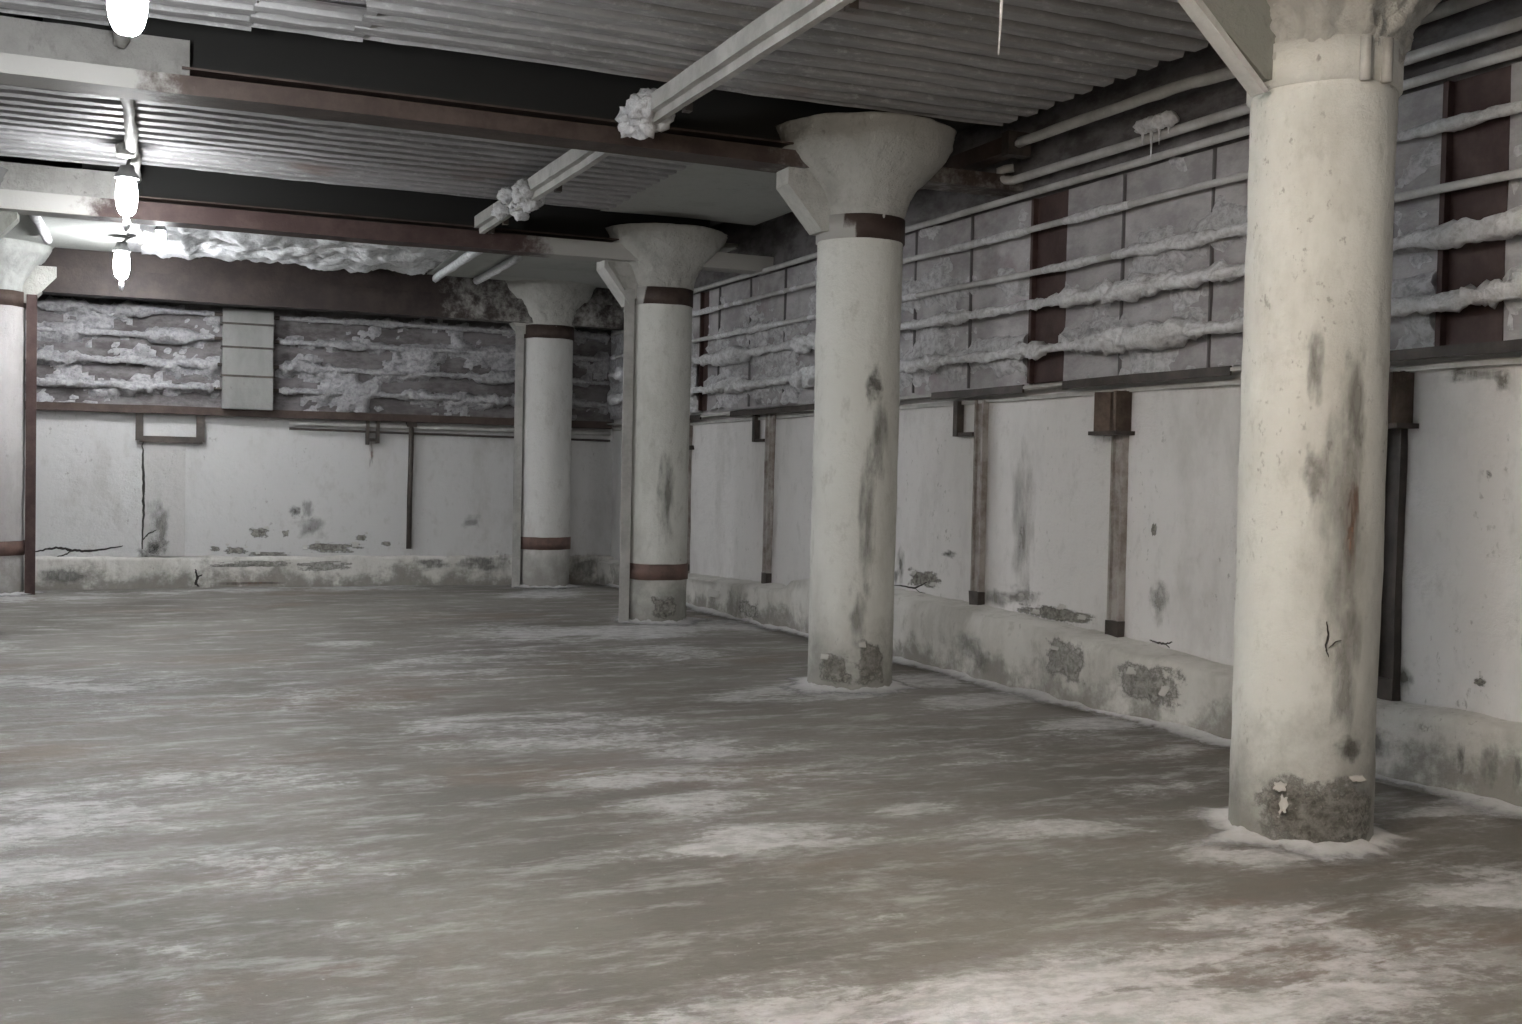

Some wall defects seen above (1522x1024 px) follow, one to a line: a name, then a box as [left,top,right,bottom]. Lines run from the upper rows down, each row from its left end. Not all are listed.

damp [867,369,881,394]
damp [1310,346,1320,384]
crack [35,442,156,557]
damp [1307,374,1361,588]
spalling [819,641,883,685]
spalling [1017,604,1093,682]
spalling [1119,662,1185,707]
damp [1337,644,1351,713]
damp [1344,735,1381,760]
spalling [1257,775,1370,846]